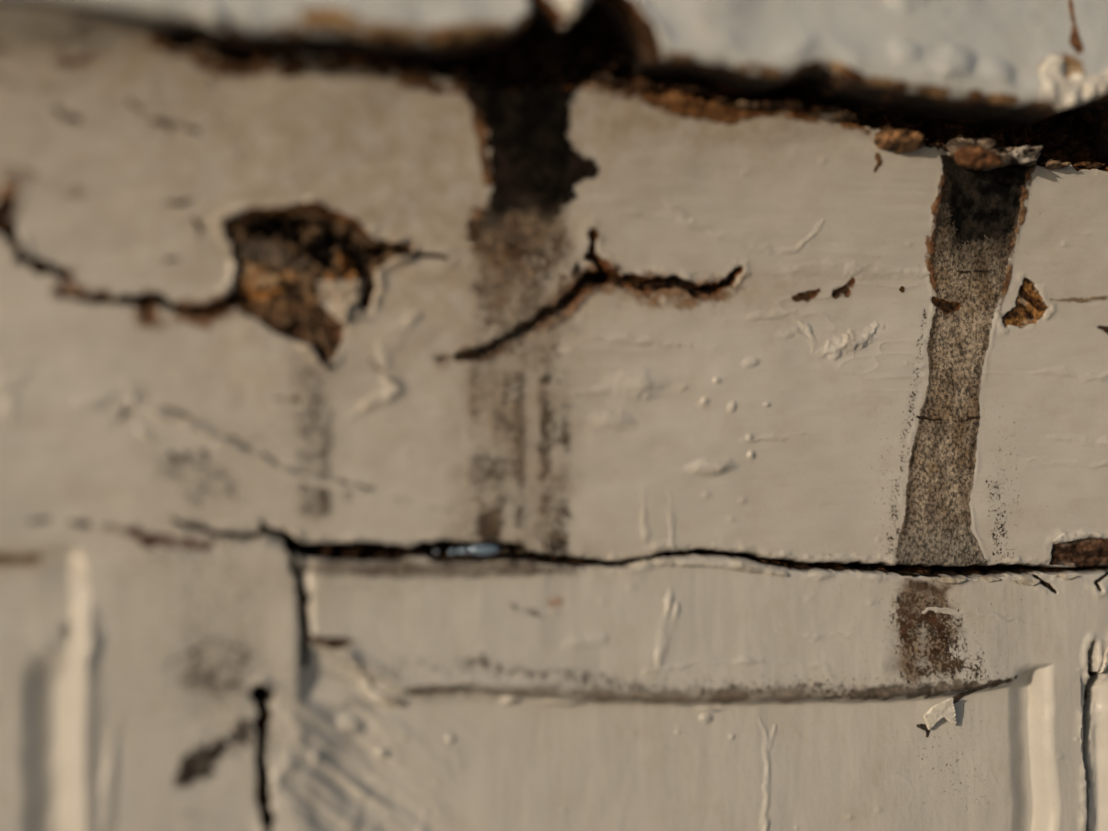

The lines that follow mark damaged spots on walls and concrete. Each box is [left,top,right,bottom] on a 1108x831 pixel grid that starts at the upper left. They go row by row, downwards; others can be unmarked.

crack [602,0,662,61]
crack [0,179,254,329]
peeling [224,200,450,369]
water stain [299,80,599,579]
crack [435,228,744,362]
peeling [1003,278,1048,328]
water stain [407,154,1036,704]
crack [173,518,1108,669]
peeling [933,576,966,584]
peeling [1050,532,1108,580]
crack [249,684,276,831]
peeling [923,698,957,730]